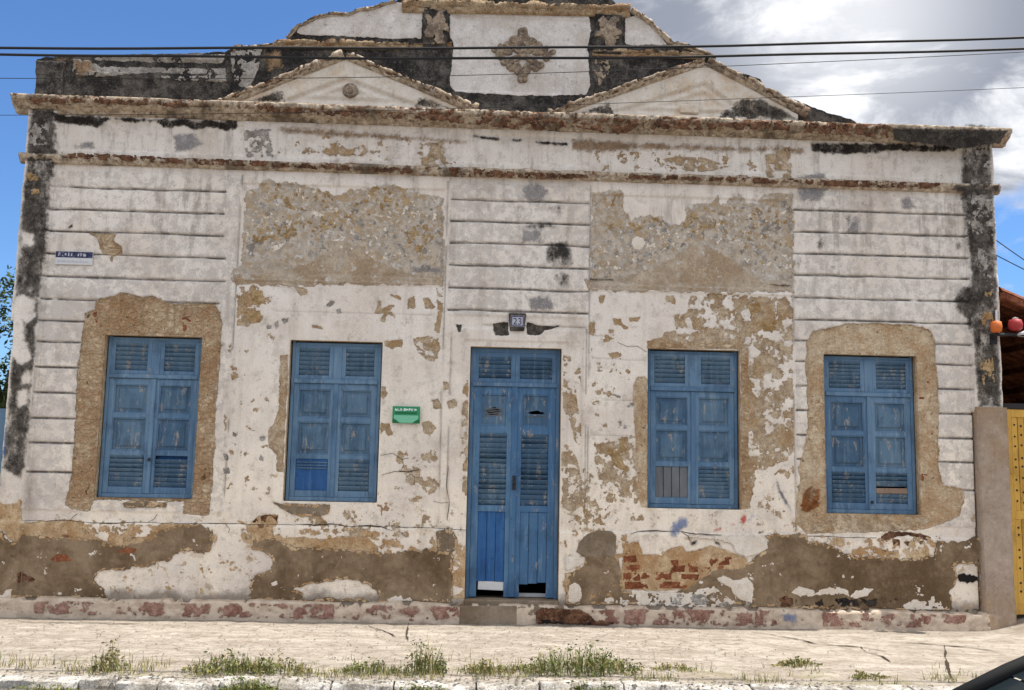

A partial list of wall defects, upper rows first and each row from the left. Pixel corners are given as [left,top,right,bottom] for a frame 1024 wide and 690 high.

leakage [4,109,460,476]
peeling [1,130,532,621]
leakage [265,51,281,71]
leakage [522,185,560,209]
leakage [530,296,553,310]
leakage [522,223,570,285]
peeling [561,150,982,628]
leakage [536,124,1008,407]